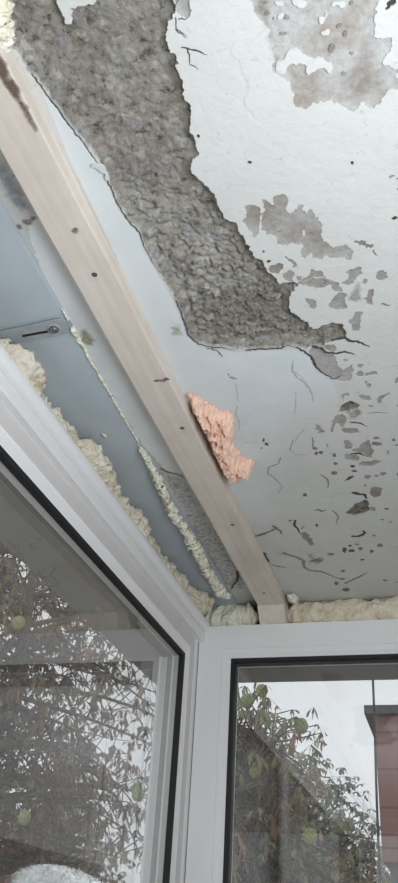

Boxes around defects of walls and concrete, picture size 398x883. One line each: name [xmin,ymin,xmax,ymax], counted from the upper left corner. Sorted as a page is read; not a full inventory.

crack [175,17,208,70]
crack [32,74,157,268]
spalling [11,0,398,487]
crack [175,301,370,492]
crack [255,525,368,592]
crack [315,509,366,537]
spalling [342,535,383,561]
crack [351,486,383,499]
spalling [346,500,393,523]